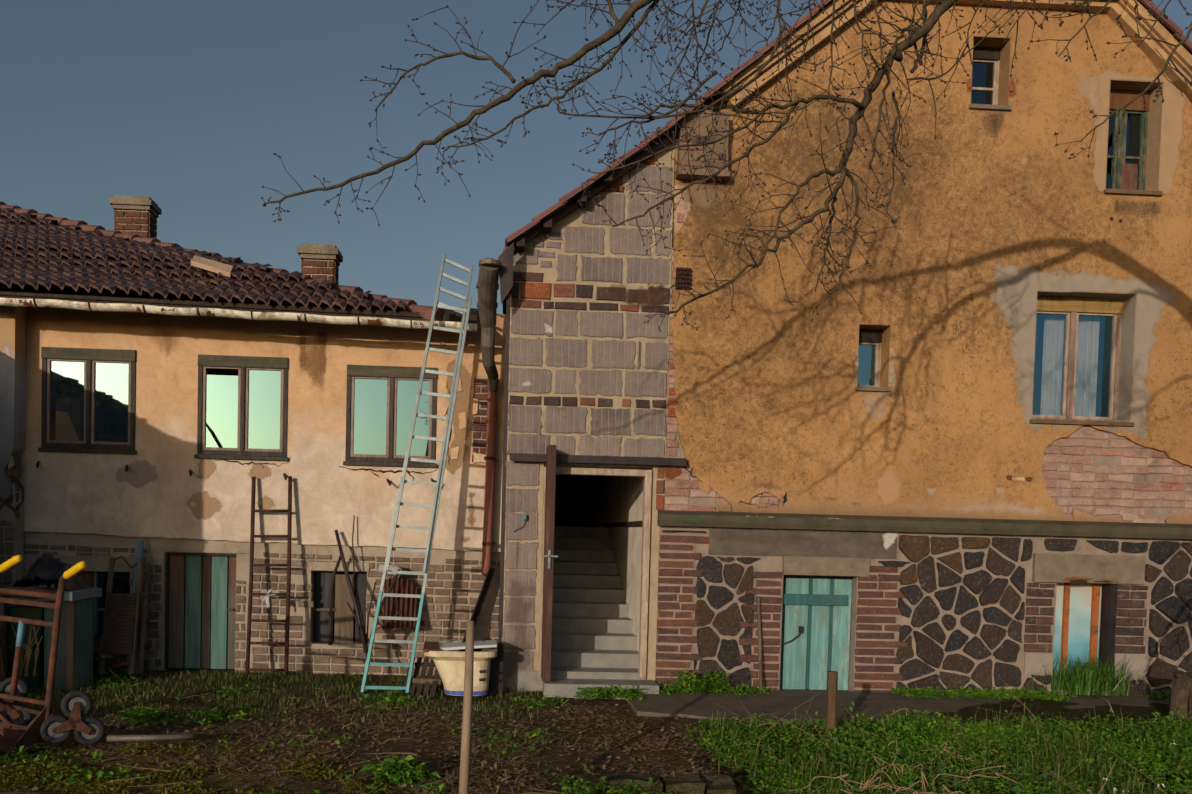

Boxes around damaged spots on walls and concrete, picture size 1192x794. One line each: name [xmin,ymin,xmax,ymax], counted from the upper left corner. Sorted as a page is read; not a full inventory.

flaking render [671,184,692,233]
water stain [296,327,330,401]
flaking render [426,334,488,475]
flaking render [664,248,787,512]
flaking render [888,347,896,387]
flaking render [115,460,158,489]
flaking render [185,459,222,520]
flaking render [1006,426,1192,524]